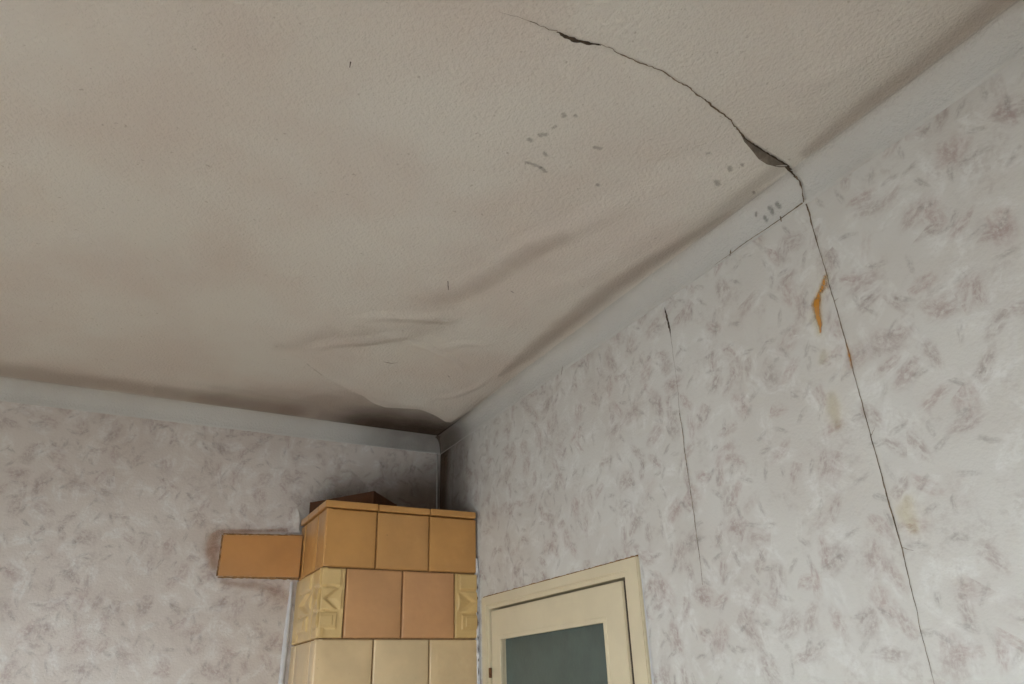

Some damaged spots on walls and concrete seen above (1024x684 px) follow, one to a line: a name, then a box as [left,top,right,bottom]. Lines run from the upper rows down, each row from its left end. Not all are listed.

crack [504,13,934,681]